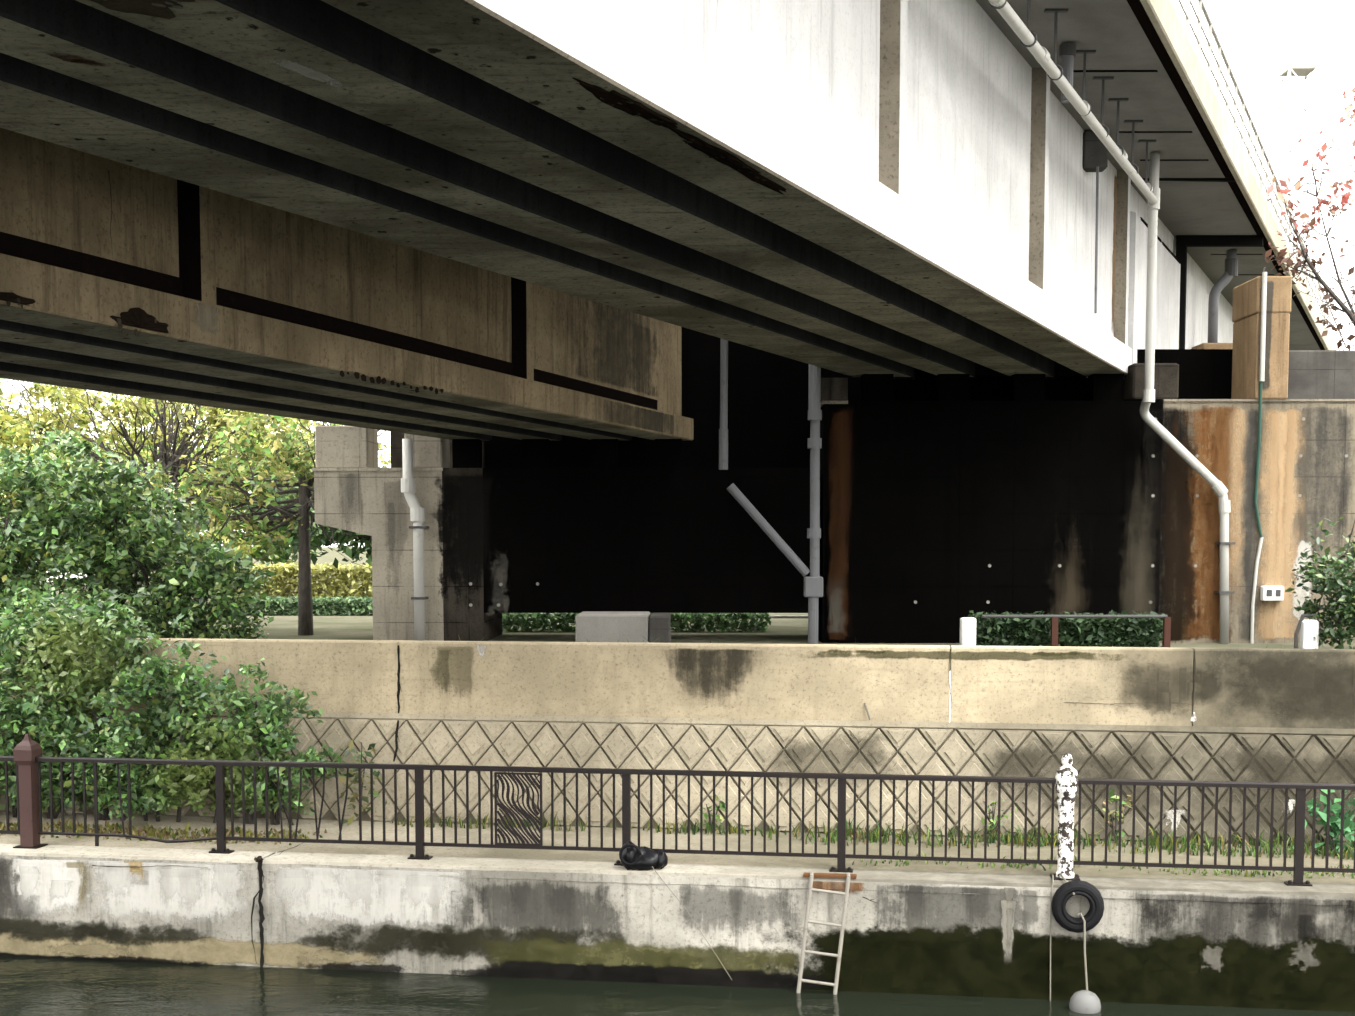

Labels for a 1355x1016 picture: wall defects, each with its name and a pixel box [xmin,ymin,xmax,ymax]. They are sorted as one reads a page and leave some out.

spalling [90,0,195,19]
spalling [573,78,787,195]
spalling [0,292,36,308]
spalling [110,307,169,336]
rust [829,410,852,640]
rust [1161,407,1235,640]
leakage [1229,409,1303,640]
crack [393,645,402,762]
leakage [676,650,752,695]
leakage [818,650,1094,661]
leakage [0,882,827,990]
leakage [880,886,1131,996]